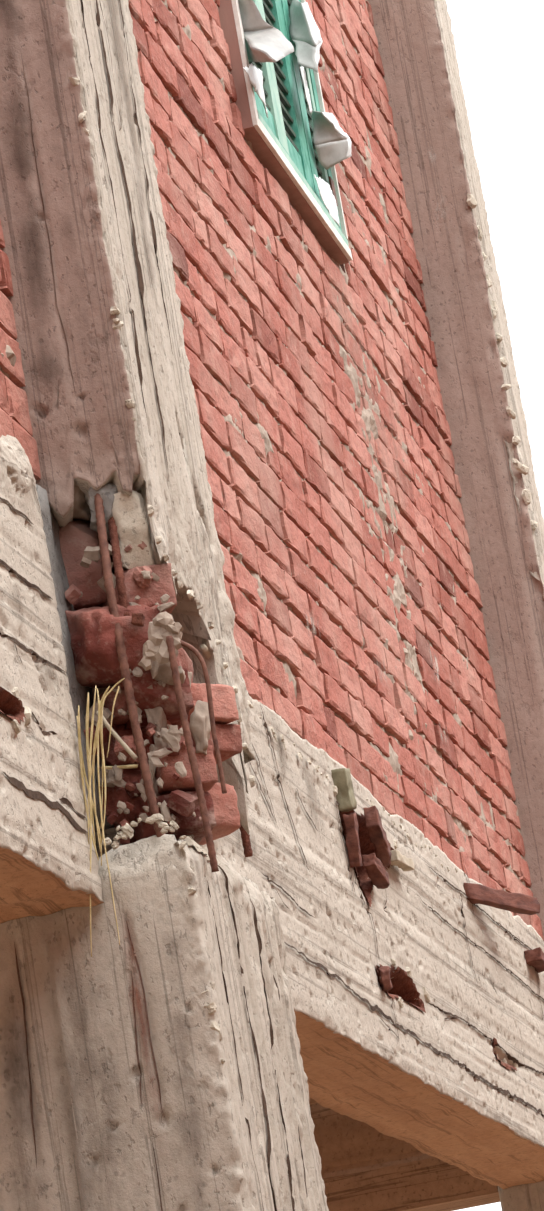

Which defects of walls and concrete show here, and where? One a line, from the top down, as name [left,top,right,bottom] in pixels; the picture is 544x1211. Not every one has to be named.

crack [80,0,185,475]
crack [0,559,53,600]
spalling [0,686,32,734]
crack [0,632,69,675]
crack [31,711,57,735]
spalling [59,493,338,872]
crack [2,771,88,833]
crack [250,704,544,1021]
spalling [339,798,458,907]
crack [126,921,165,1211]
crack [202,855,544,1211]
spalling [375,958,430,1013]